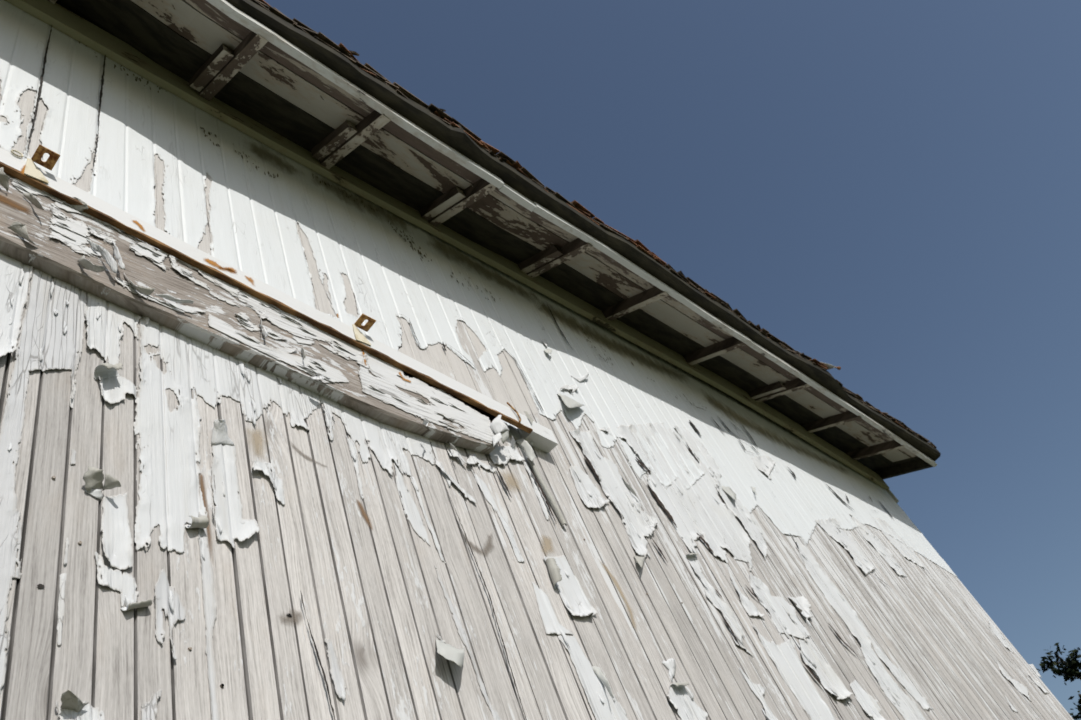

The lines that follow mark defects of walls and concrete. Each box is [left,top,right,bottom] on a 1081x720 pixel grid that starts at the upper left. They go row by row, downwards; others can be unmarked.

peeling [0,90,46,160]
peeling [0,152,567,720]
peeling [557,372,589,408]
peeling [532,555,629,720]
peeling [569,422,934,720]